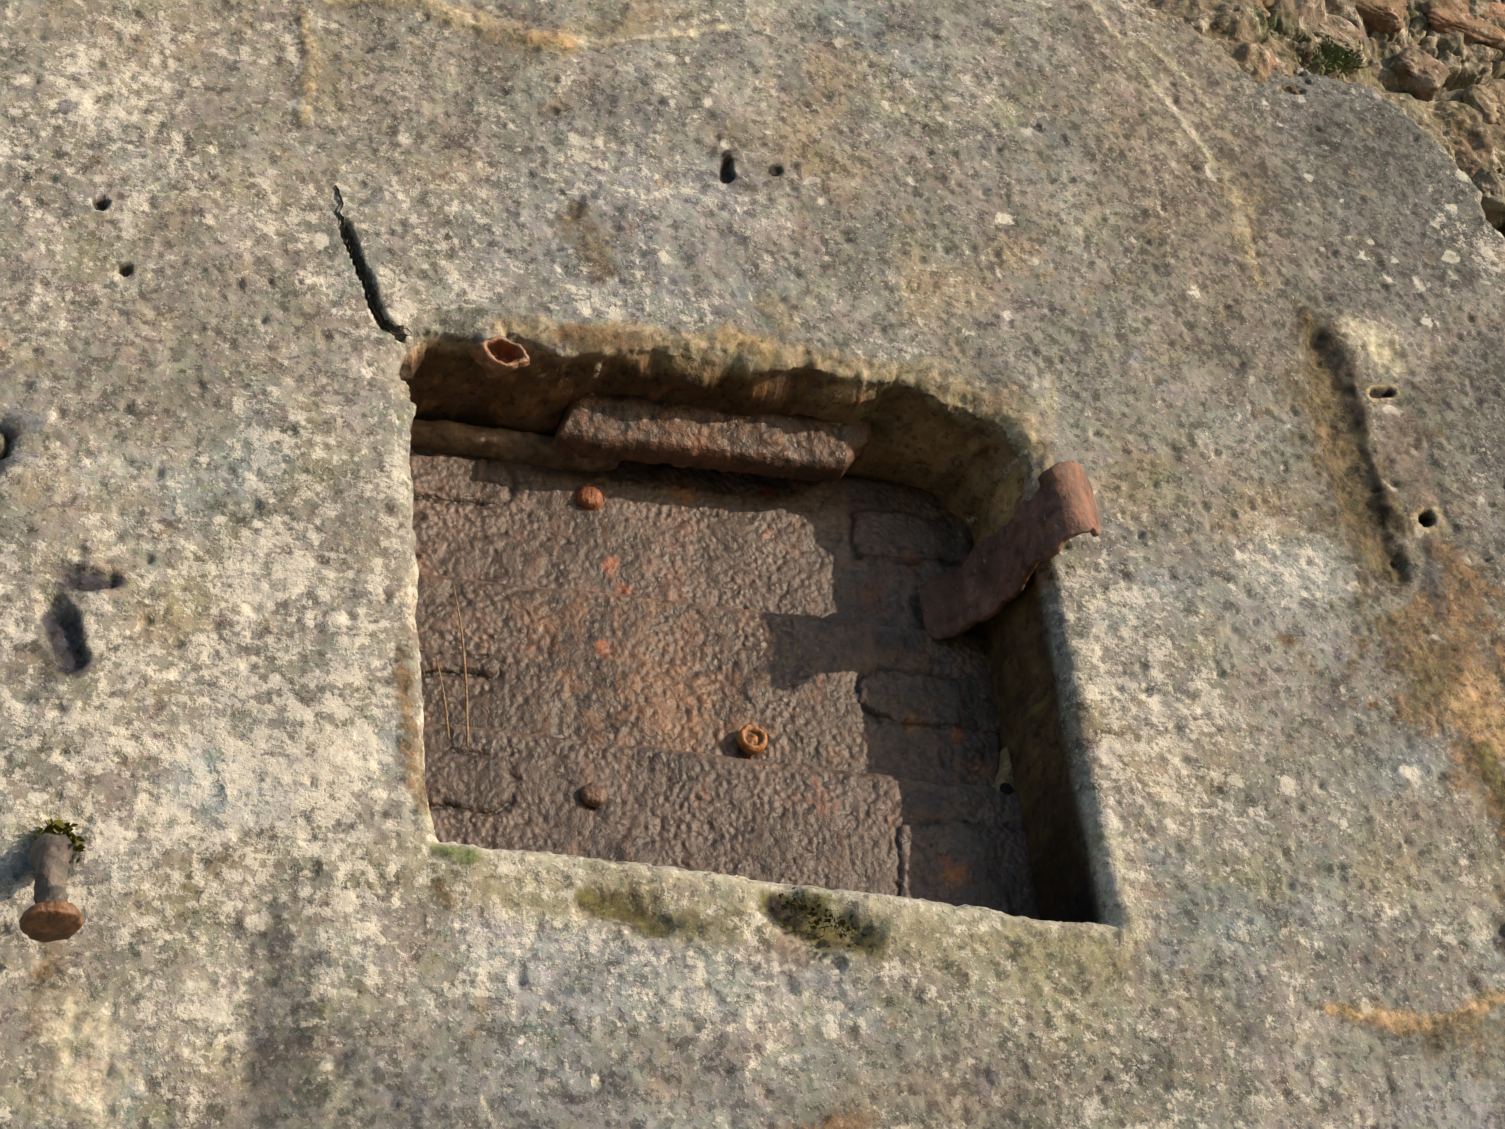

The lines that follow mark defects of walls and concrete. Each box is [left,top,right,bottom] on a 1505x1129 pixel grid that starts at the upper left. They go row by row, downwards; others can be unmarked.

crack [335,185,412,336]
corrosion [393,648,429,813]
corrosion [433,843,482,863]